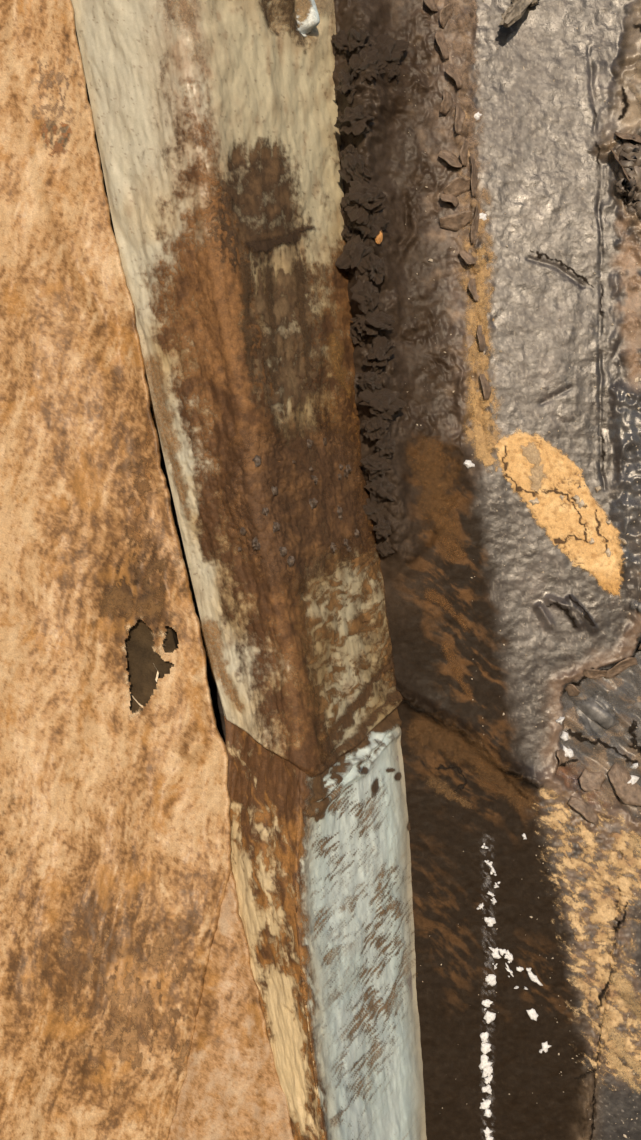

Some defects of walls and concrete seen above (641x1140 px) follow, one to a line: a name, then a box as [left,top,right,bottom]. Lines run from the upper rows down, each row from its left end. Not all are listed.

rust [145,70,403,1140]
water stain [479,947,543,1140]
water stain [408,717,641,1093]
crack [574,841,628,1140]